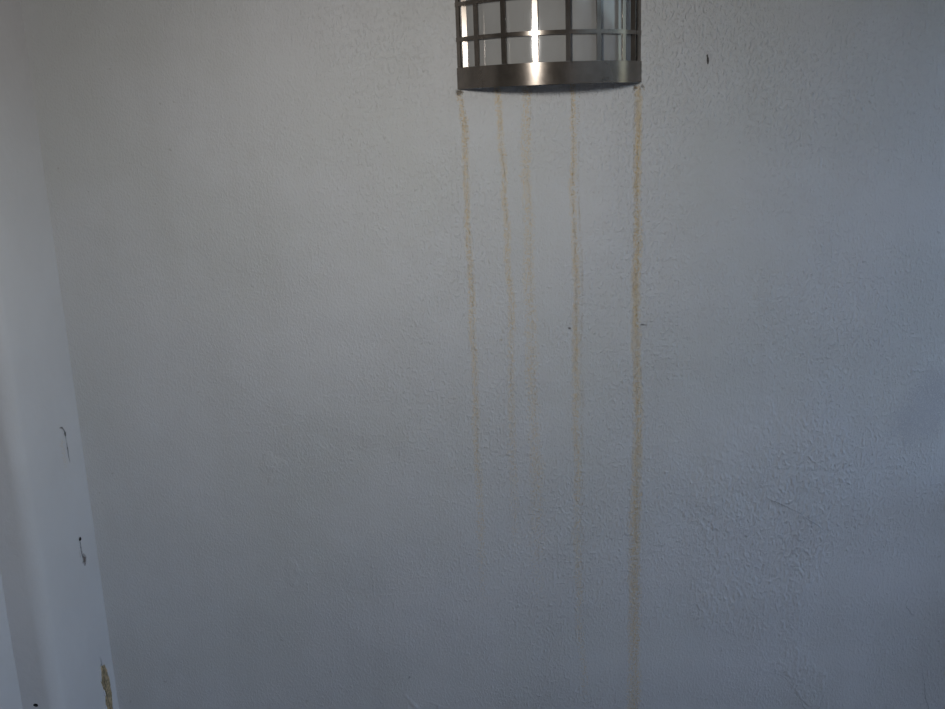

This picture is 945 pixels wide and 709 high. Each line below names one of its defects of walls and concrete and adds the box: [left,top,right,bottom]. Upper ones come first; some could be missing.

rust [626,84,645,709]